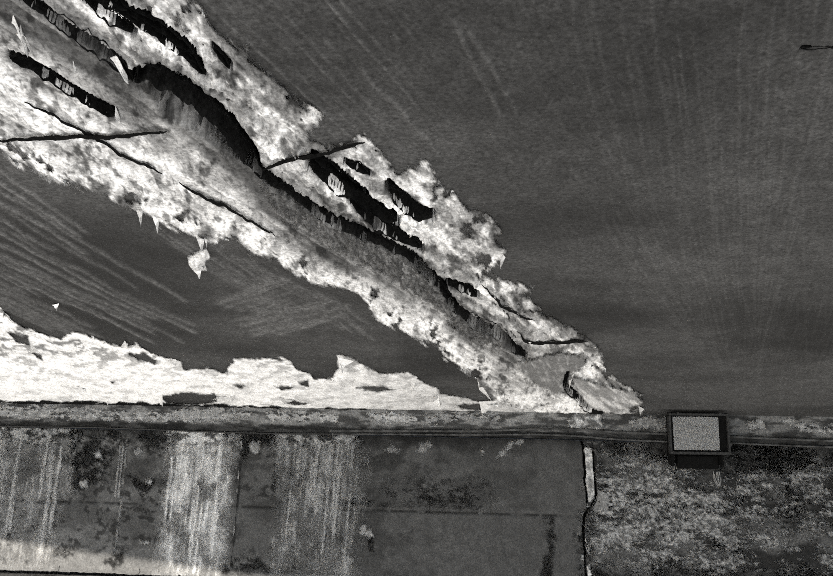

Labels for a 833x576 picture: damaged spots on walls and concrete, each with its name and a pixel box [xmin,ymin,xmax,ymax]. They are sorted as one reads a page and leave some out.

crack [0,0,588,357]
peeling [0,0,646,415]
leakage [0,427,70,558]
crack [0,401,279,409]
leakage [164,430,232,573]
crack [231,441,243,563]
leakage [274,432,358,550]
crack [563,371,610,576]